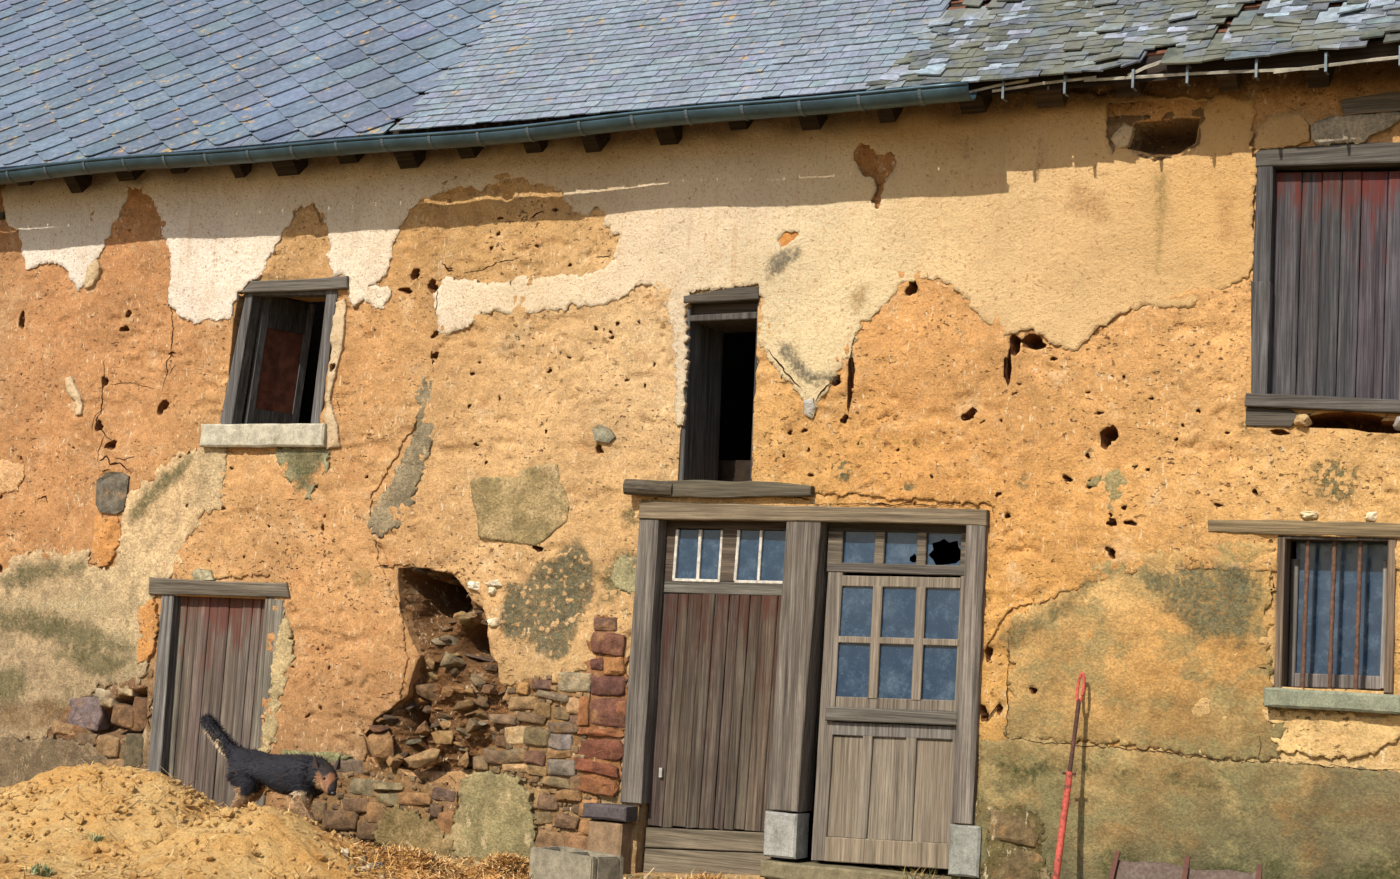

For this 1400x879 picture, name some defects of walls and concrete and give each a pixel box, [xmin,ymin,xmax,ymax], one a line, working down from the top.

spalling [854,142,897,209]
spalling [1106,107,1205,161]
spalling [0,187,236,573]
spalling [171,173,687,850]
spalling [751,270,1400,662]
leakage [0,562,133,674]
leakage [501,541,632,660]
leakage [1143,565,1260,646]
crack [985,627,1400,771]